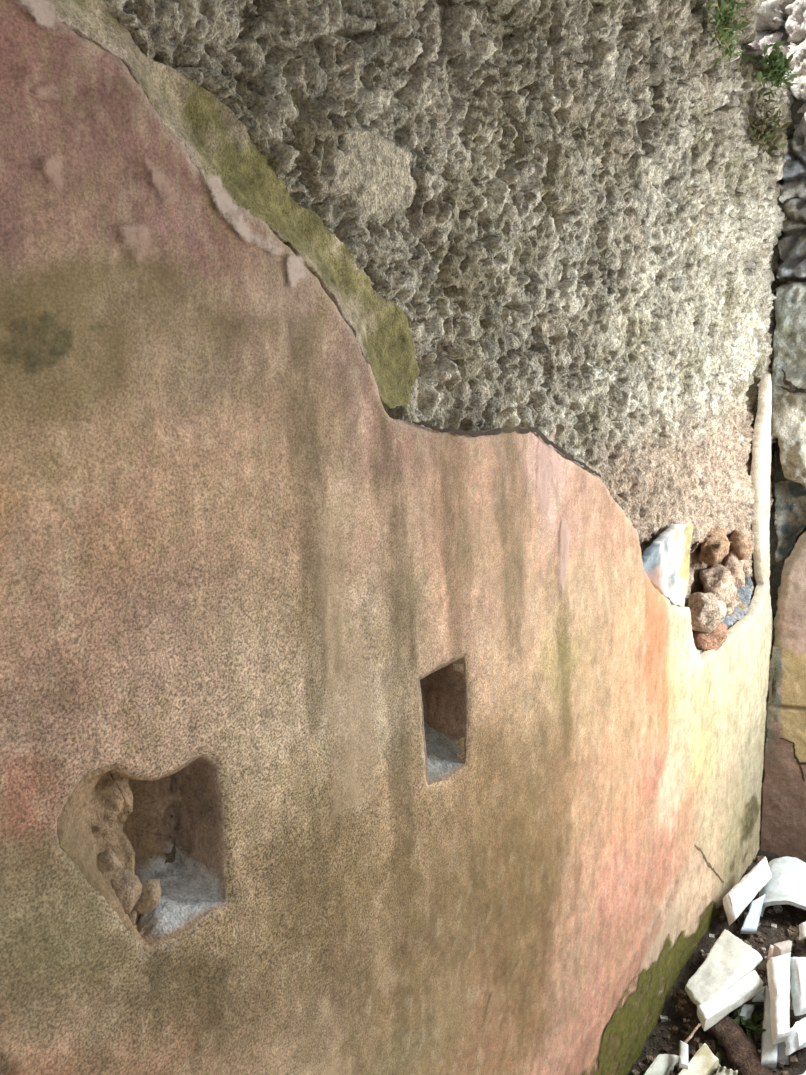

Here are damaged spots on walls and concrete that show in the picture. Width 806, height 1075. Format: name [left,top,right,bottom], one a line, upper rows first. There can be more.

peeling [21,0,65,28]
peeling [45,159,63,188]
spalling [103,0,806,654]
crack [781,369,806,394]
crack [781,738,806,781]
spalling [56,754,228,952]
damp [641,902,682,972]